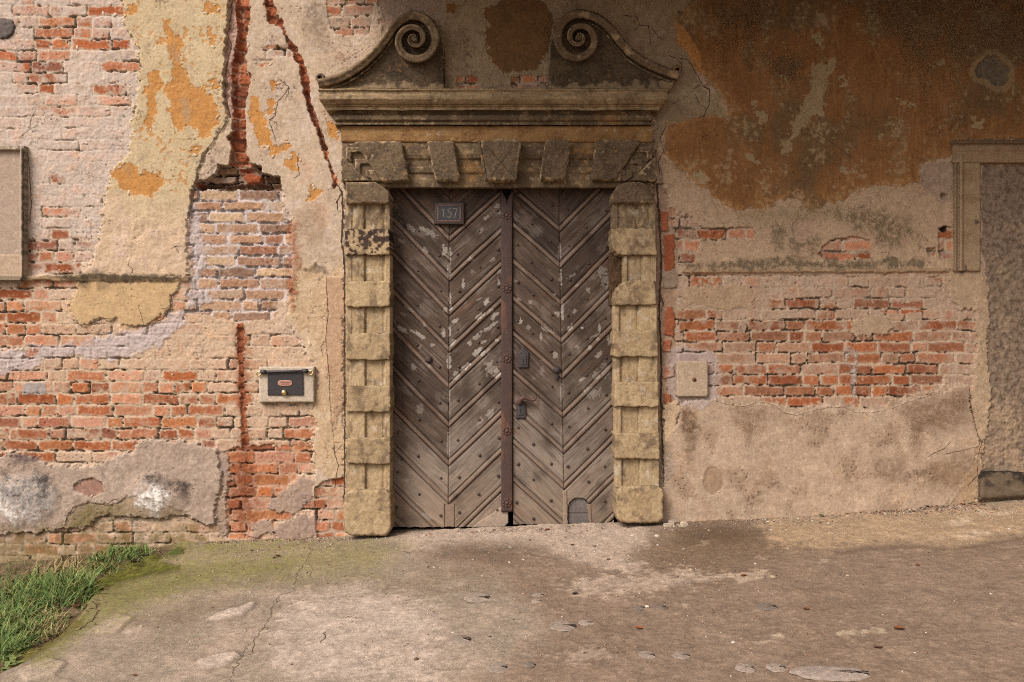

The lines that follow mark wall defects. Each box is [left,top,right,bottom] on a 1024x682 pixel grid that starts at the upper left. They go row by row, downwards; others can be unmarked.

flaking render [101,1,141,19]
flaking render [13,37,119,114]
flaking render [97,79,129,112]
peeling [143,19,302,192]
peeling [109,162,165,199]
flaking render [28,223,93,273]
flaking render [661,212,755,289]
flaking render [926,226,953,260]
flaking render [663,302,980,413]
flaking render [0,323,346,541]
damp [0,476,54,523]
damp [134,475,186,514]